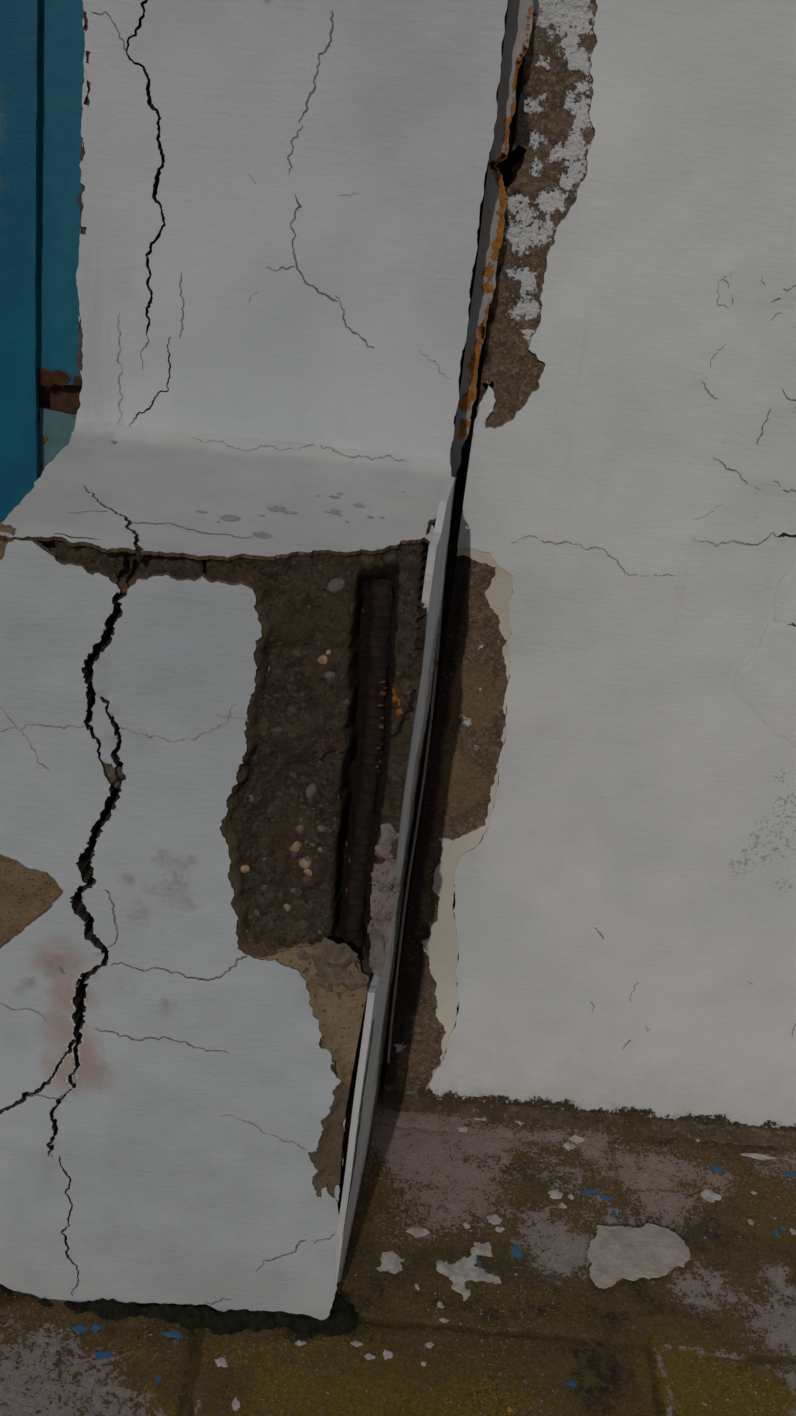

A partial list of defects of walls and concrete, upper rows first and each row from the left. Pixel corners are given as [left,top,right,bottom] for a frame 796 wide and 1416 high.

peeling [0,854,63,946]
crack [0,488,249,1292]
crack [91,0,184,424]
spalling [43,520,513,1203]
crack [248,10,374,348]
corrosion [377,680,405,729]
corrosion [457,5,534,438]
peeling [474,0,597,428]
crack [511,535,675,576]
crack [701,347,723,399]
crack [692,389,796,546]